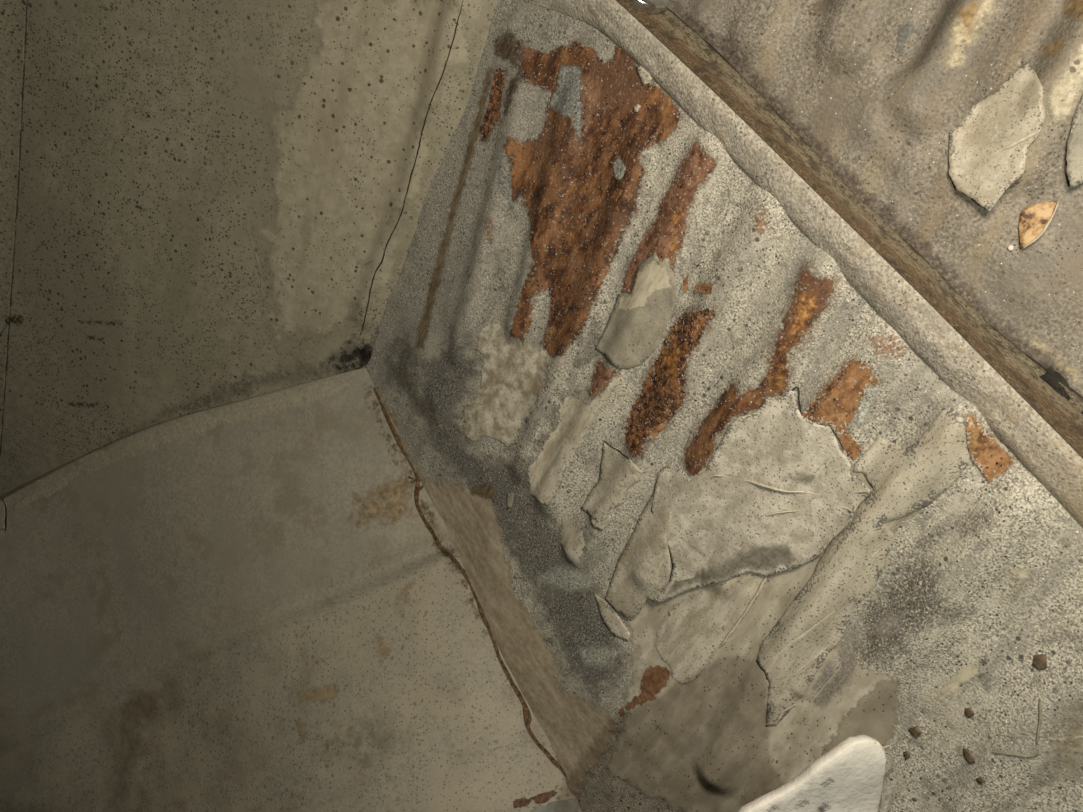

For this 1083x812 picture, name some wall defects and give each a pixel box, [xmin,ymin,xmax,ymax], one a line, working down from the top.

crack [359,2,463,336]
rust [418,33,680,357]
rust [622,142,717,293]
peeling [949,62,1045,211]
peeling [1066,95,1083,188]
rust [624,308,715,457]
rust [683,265,834,476]
rust [802,359,880,460]
rust [966,412,1013,482]
crack [373,387,569,781]
peeling [418,252,970,812]
rust [619,665,670,715]